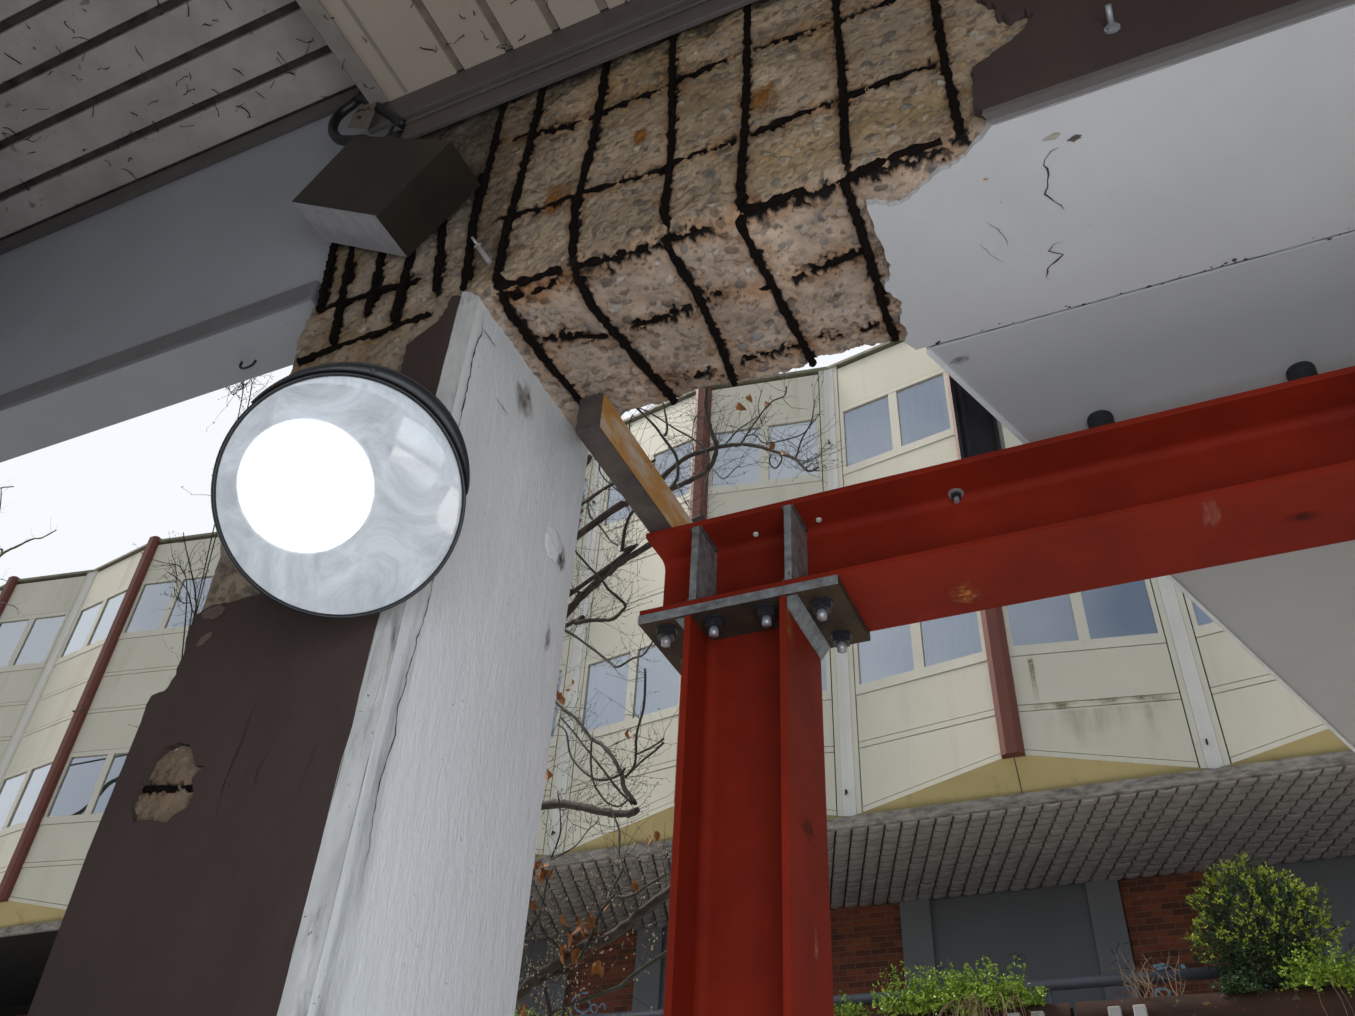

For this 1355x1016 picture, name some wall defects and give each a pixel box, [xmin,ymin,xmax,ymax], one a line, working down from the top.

spalling [289,0,1028,431]
crack [1043,148,1064,209]
crack [931,228,1355,347]
spalling [197,544,260,647]
spalling [135,746,201,823]